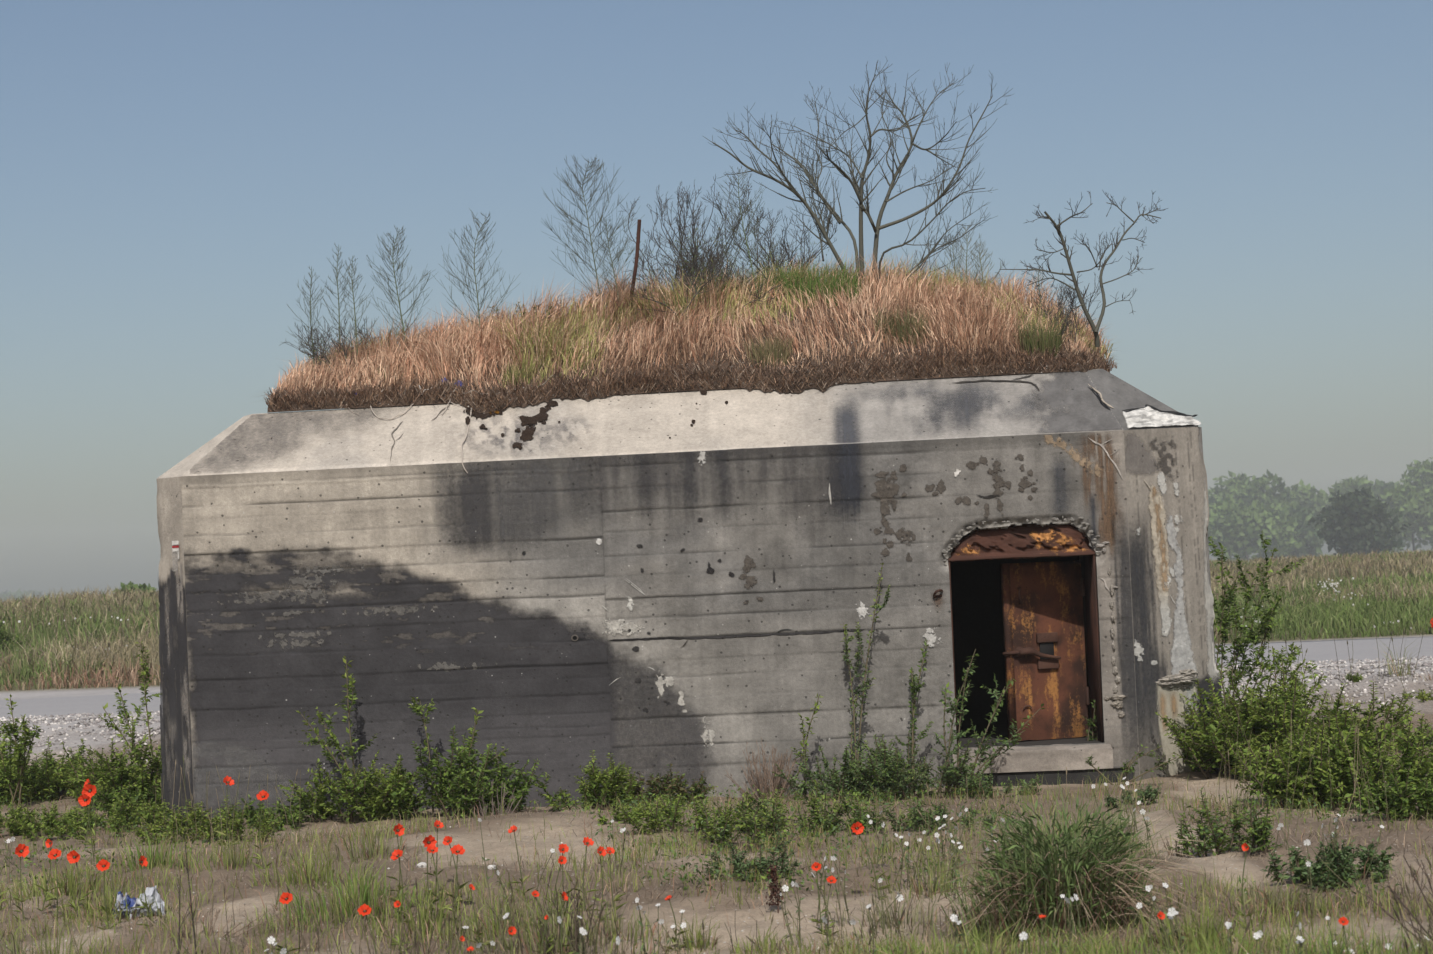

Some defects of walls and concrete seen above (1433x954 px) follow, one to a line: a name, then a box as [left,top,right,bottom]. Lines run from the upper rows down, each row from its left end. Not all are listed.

leakage [440,409,862,543]
peeling [871,464,916,561]
peeling [925,454,1101,562]
corrosion [1030,530,1084,552]
corrosion [1044,435,1117,548]
spalling [1122,404,1201,476]
leakage [158,547,705,820]